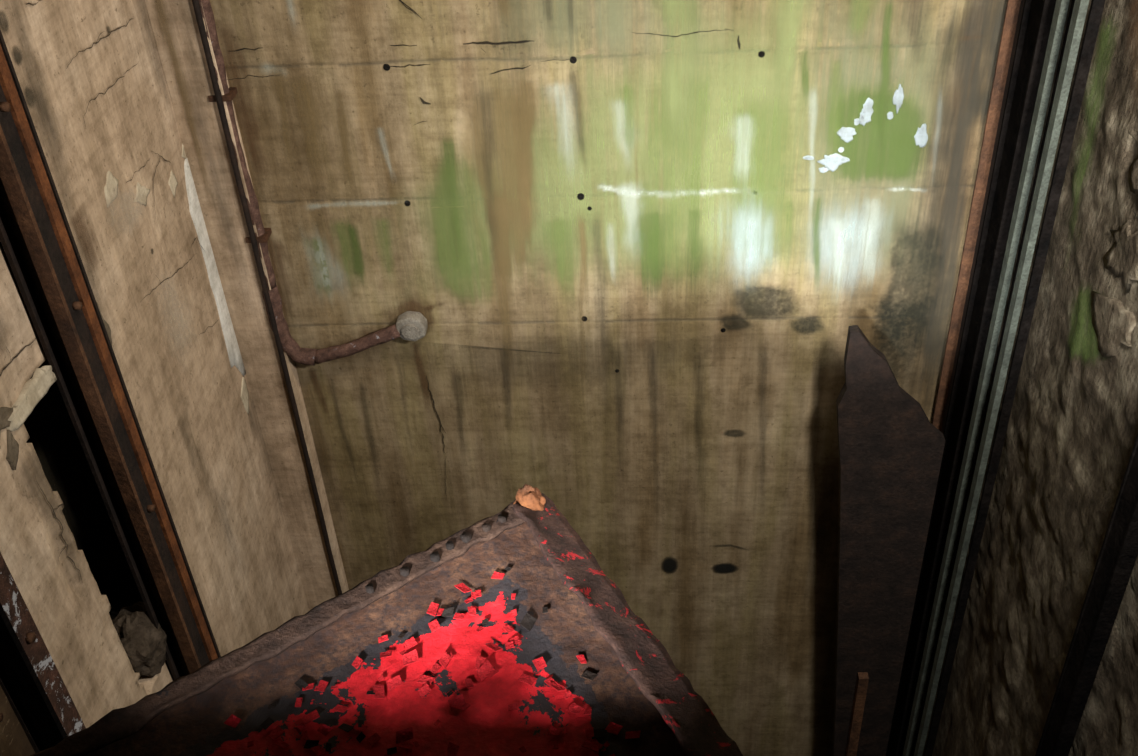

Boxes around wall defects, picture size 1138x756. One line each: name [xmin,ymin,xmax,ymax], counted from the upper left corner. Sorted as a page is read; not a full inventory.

crack [67,19,131,67]
crack [83,63,138,127]
peeling [803,84,904,173]
peeling [914,123,928,148]
spalling [0,365,57,470]
peeling [366,633,419,699]
peeling [426,583,548,711]
peeling [260,678,420,756]
peeling [518,655,641,756]